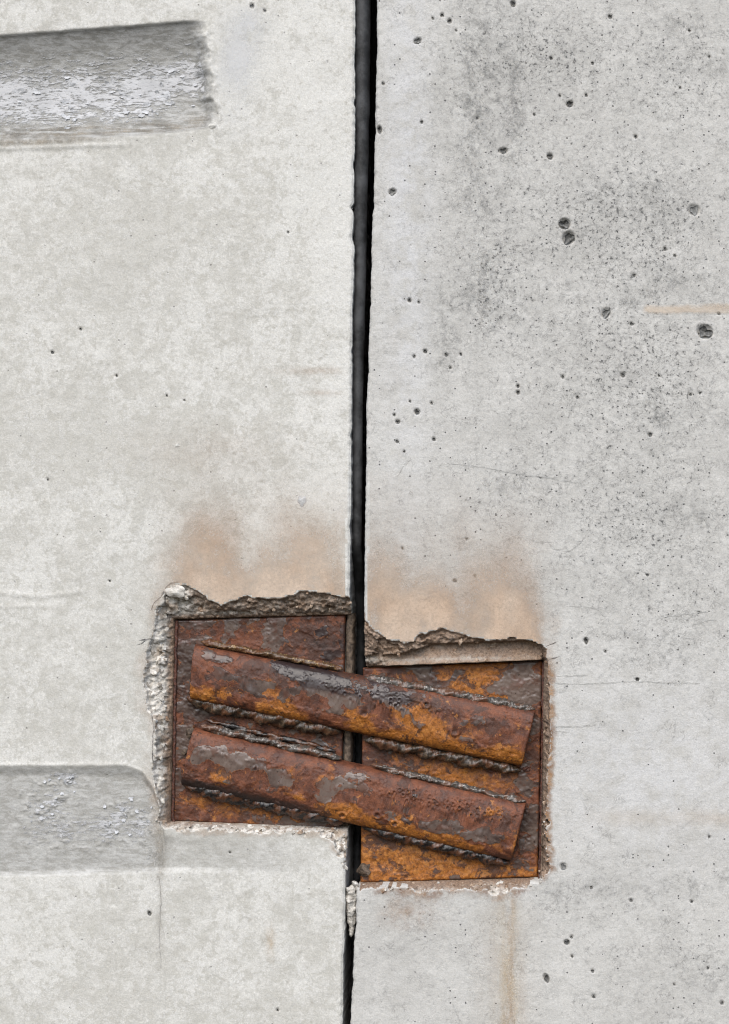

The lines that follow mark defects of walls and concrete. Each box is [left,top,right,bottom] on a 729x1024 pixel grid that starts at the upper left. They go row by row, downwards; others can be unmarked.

spalling [23,584,352,870]
corrosion [173,523,345,604]
corrosion [367,558,541,644]
spalling [360,613,552,896]